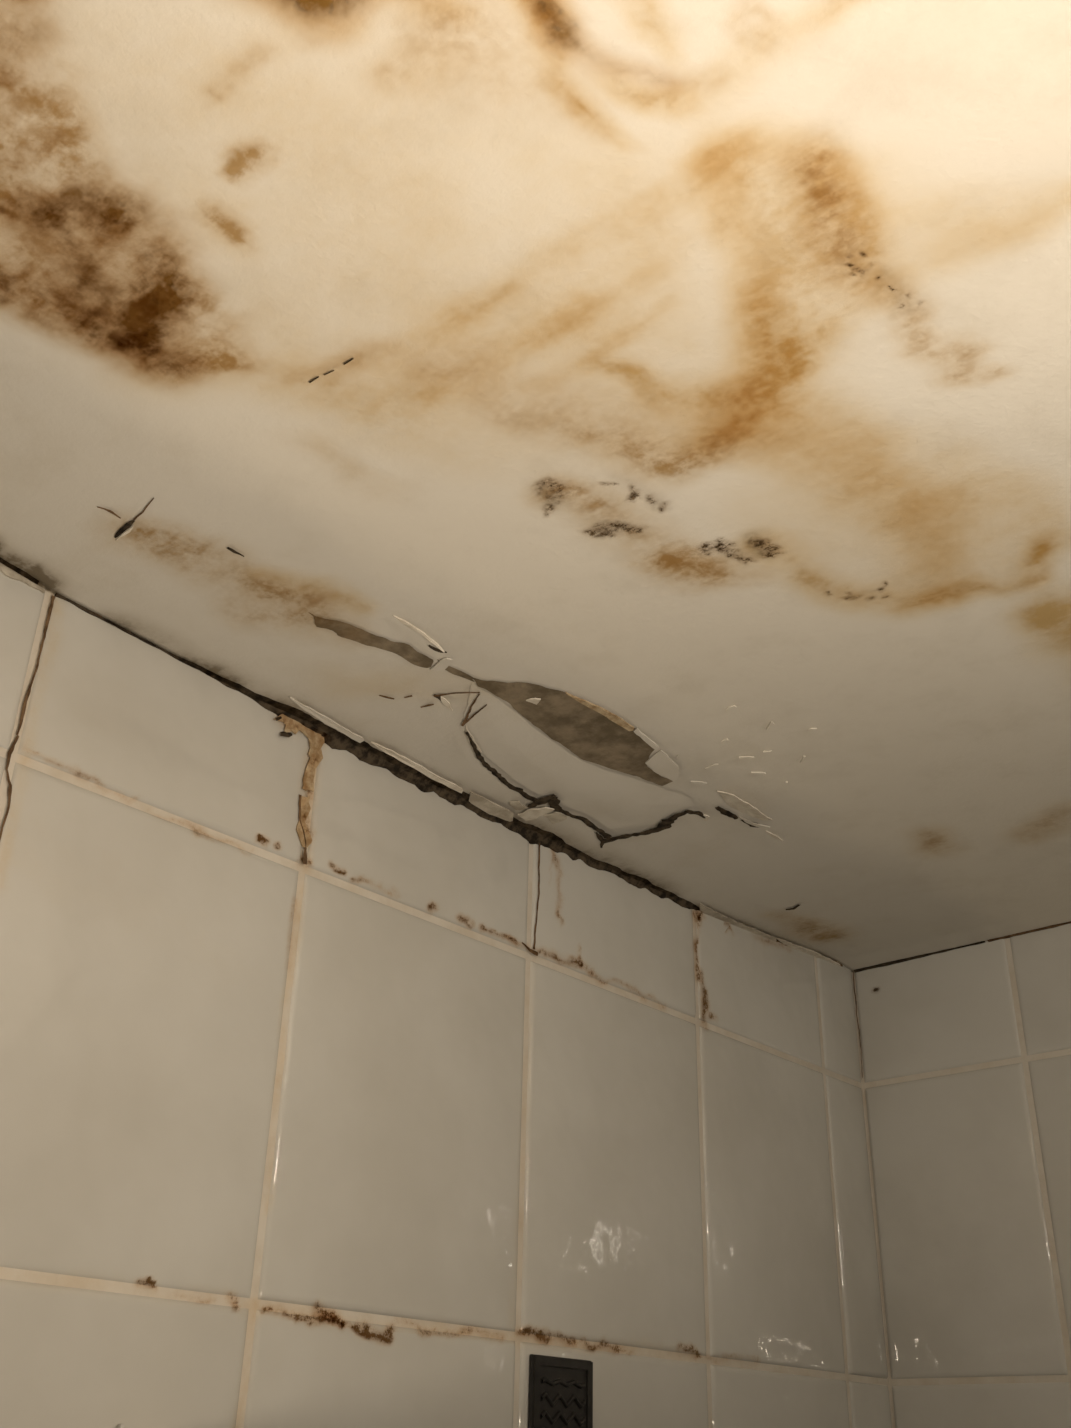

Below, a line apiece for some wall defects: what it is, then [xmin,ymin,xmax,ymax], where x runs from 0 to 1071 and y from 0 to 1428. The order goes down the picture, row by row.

leakage [296,0,347,12]
leakage [100,207,128,225]
leakage [114,274,183,348]
crack [97,498,154,541]
leakage [585,523,641,537]
leakage [701,540,778,561]
peeling [310,613,783,841]
crack [0,548,1071,1078]